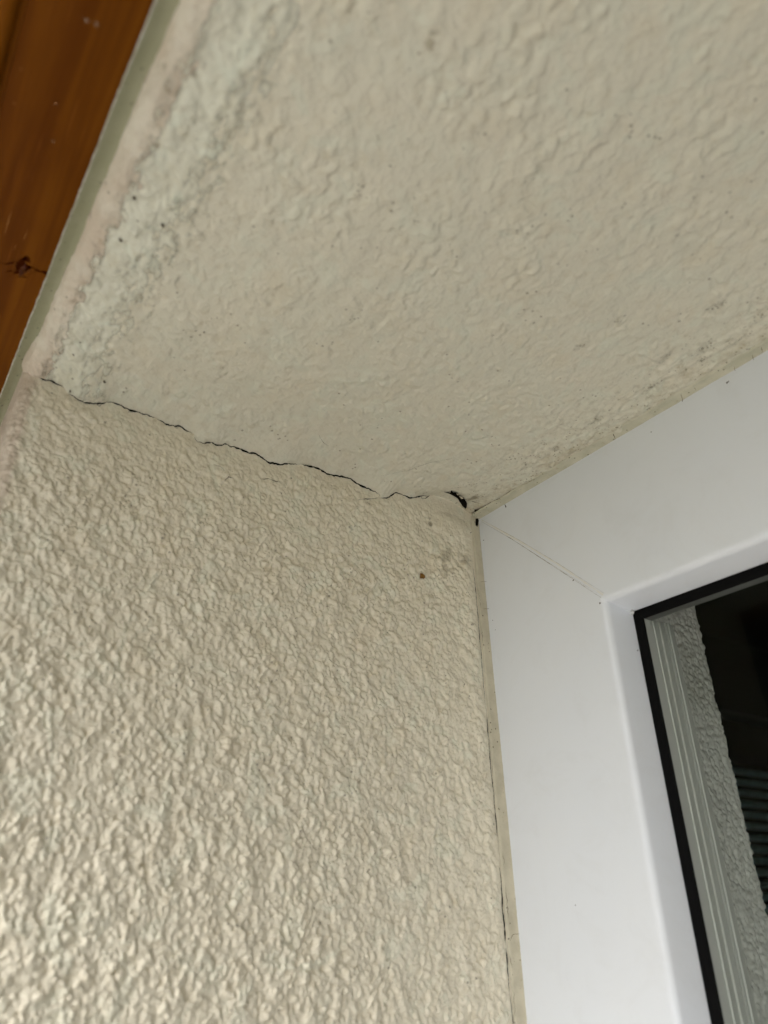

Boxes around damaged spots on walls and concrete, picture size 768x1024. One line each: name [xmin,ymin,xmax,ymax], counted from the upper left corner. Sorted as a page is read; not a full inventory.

crack [40,378,429,503]